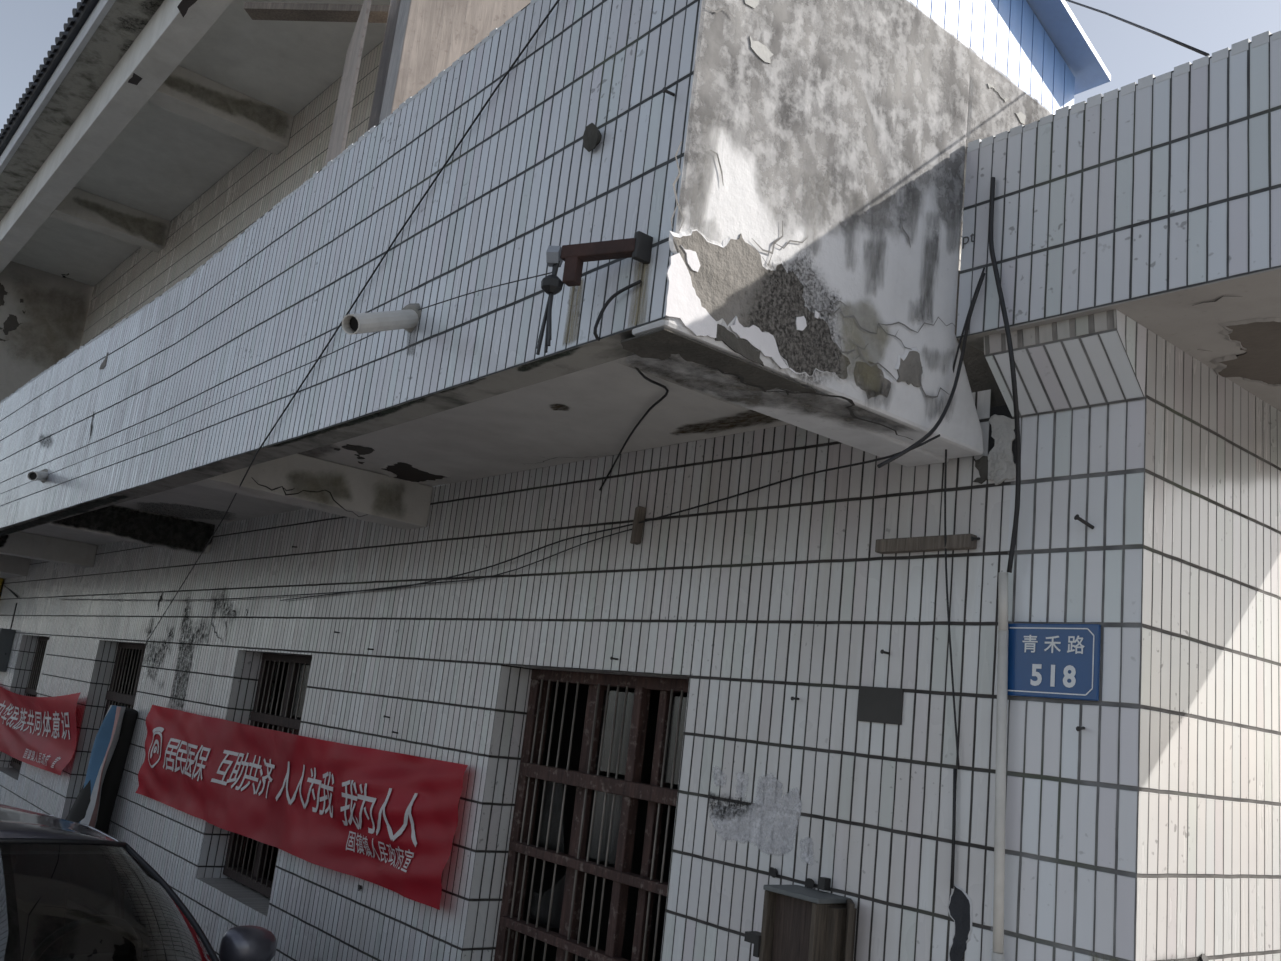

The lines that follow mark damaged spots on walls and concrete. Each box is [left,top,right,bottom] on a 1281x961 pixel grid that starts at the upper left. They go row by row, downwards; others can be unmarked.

flaking render [177,0,197,17]
damp [678,0,1047,230]
crack [753,220,809,266]
peeling [0,283,26,342]
flaking render [621,227,924,399]
crack [809,297,955,398]
peeling [1210,317,1281,387]
crack [705,366,913,440]
peeling [334,444,451,483]
spalling [973,456,988,484]
damp [170,597,209,709]
spalling [947,884,973,961]